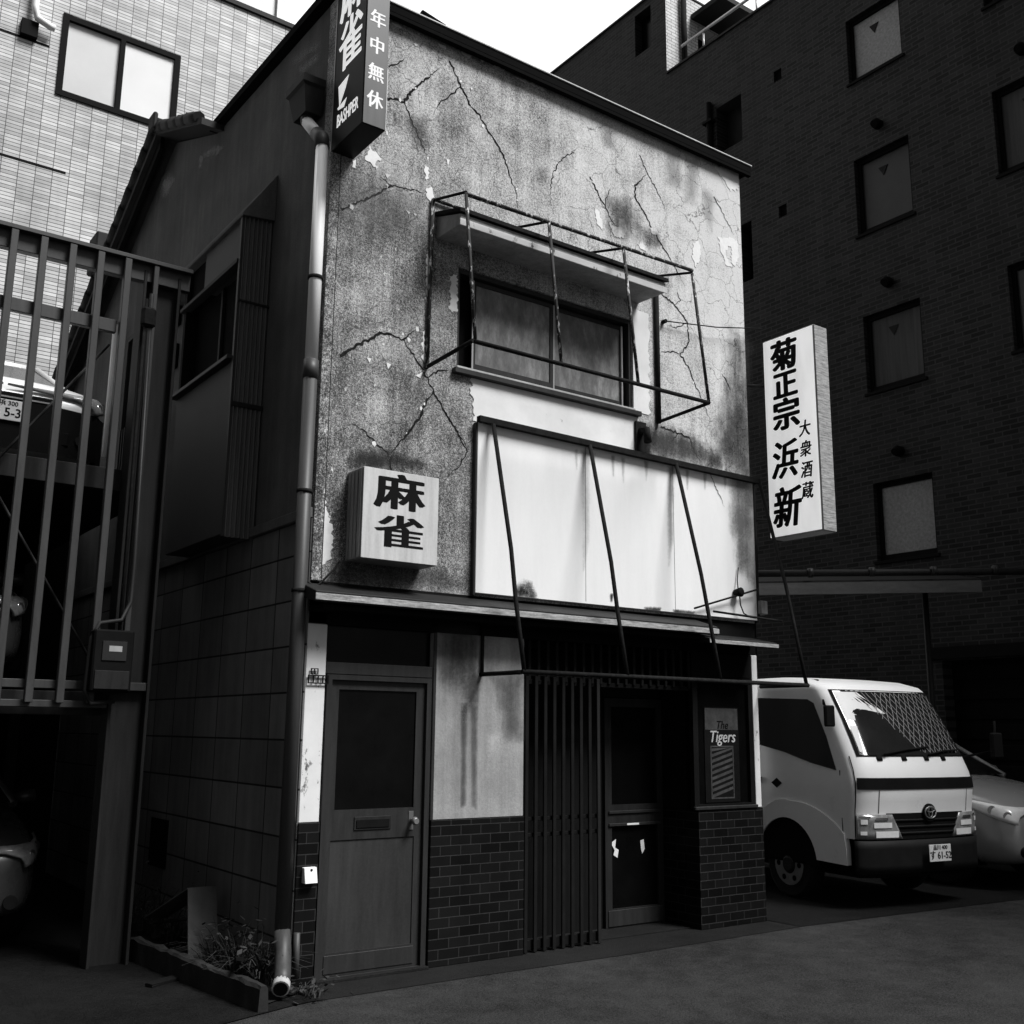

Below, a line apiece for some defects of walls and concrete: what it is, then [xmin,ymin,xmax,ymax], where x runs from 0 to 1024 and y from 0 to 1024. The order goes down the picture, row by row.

crack [387,61,519,210]
peeling [352,146,390,178]
peeling [424,157,435,203]
peeling [594,208,627,238]
water stain [612,202,634,234]
peeling [692,240,701,267]
crack [590,155,710,418]
crack [339,326,468,483]
water stain [446,628,478,803]